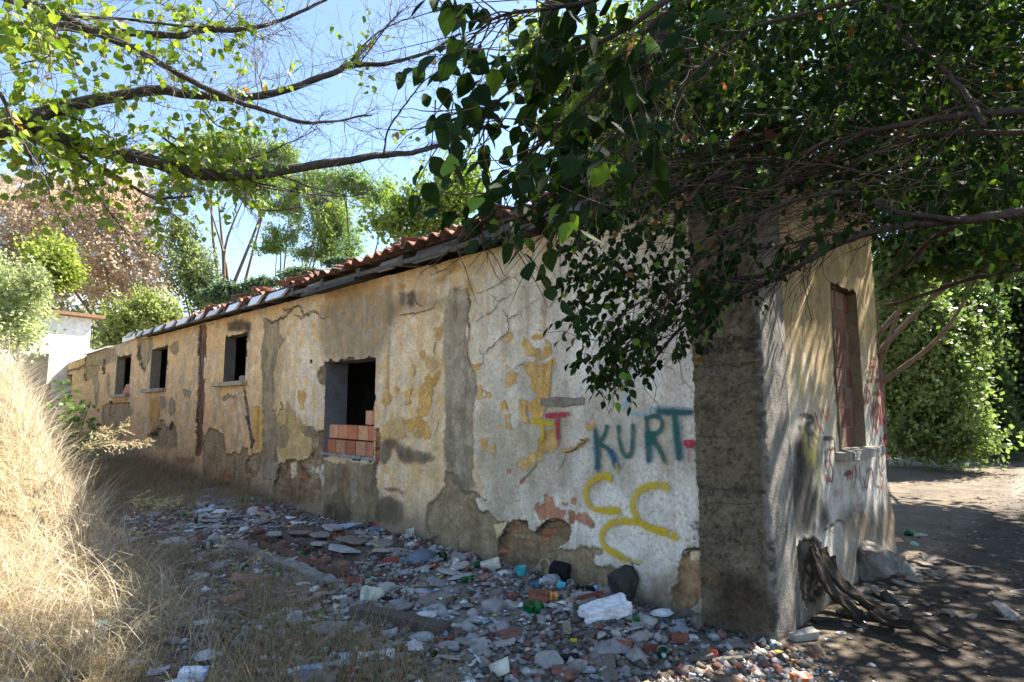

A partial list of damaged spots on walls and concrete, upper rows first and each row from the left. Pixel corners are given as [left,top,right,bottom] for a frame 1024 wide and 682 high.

crack [267,305,326,331]
crack [401,272,558,379]
peeling [141,288,622,587]
flaking render [671,547,702,610]